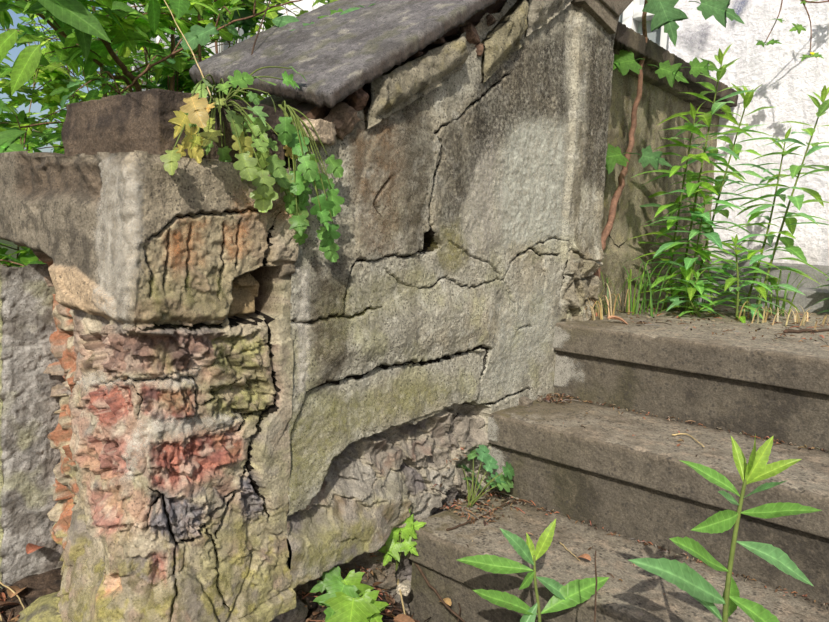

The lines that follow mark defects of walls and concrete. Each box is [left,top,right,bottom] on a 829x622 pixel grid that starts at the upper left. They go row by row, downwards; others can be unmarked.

crack [433,74,508,177]
spalling [0,202,491,622]
crack [136,200,569,621]